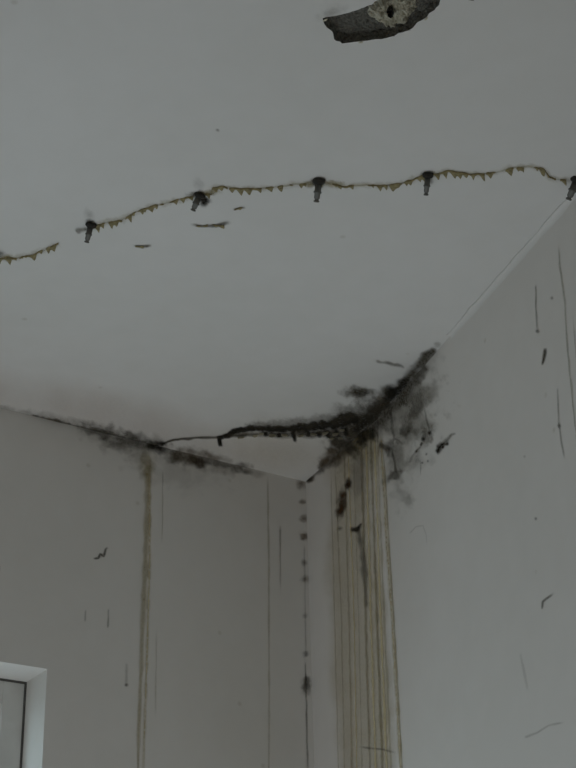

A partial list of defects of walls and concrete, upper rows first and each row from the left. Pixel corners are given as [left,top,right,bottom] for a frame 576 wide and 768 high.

spalling [323,0,440,44]
crack [95,167,566,232]
crack [0,243,58,265]
leakage [33,415,165,451]
leakage [174,454,208,468]
leakage [311,349,436,768]